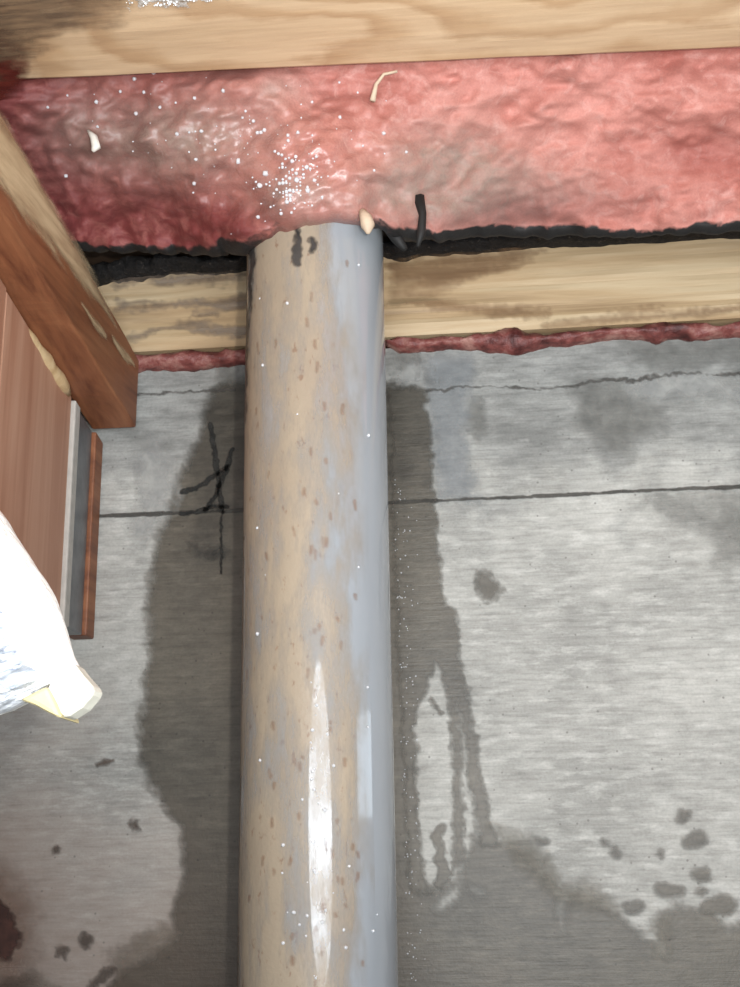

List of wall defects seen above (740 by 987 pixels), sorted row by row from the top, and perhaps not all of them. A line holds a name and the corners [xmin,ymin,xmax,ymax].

damp [0,0,108,101]
damp [126,0,212,9]
damp [90,366,245,987]
damp [386,353,740,987]
damp [80,932,93,948]